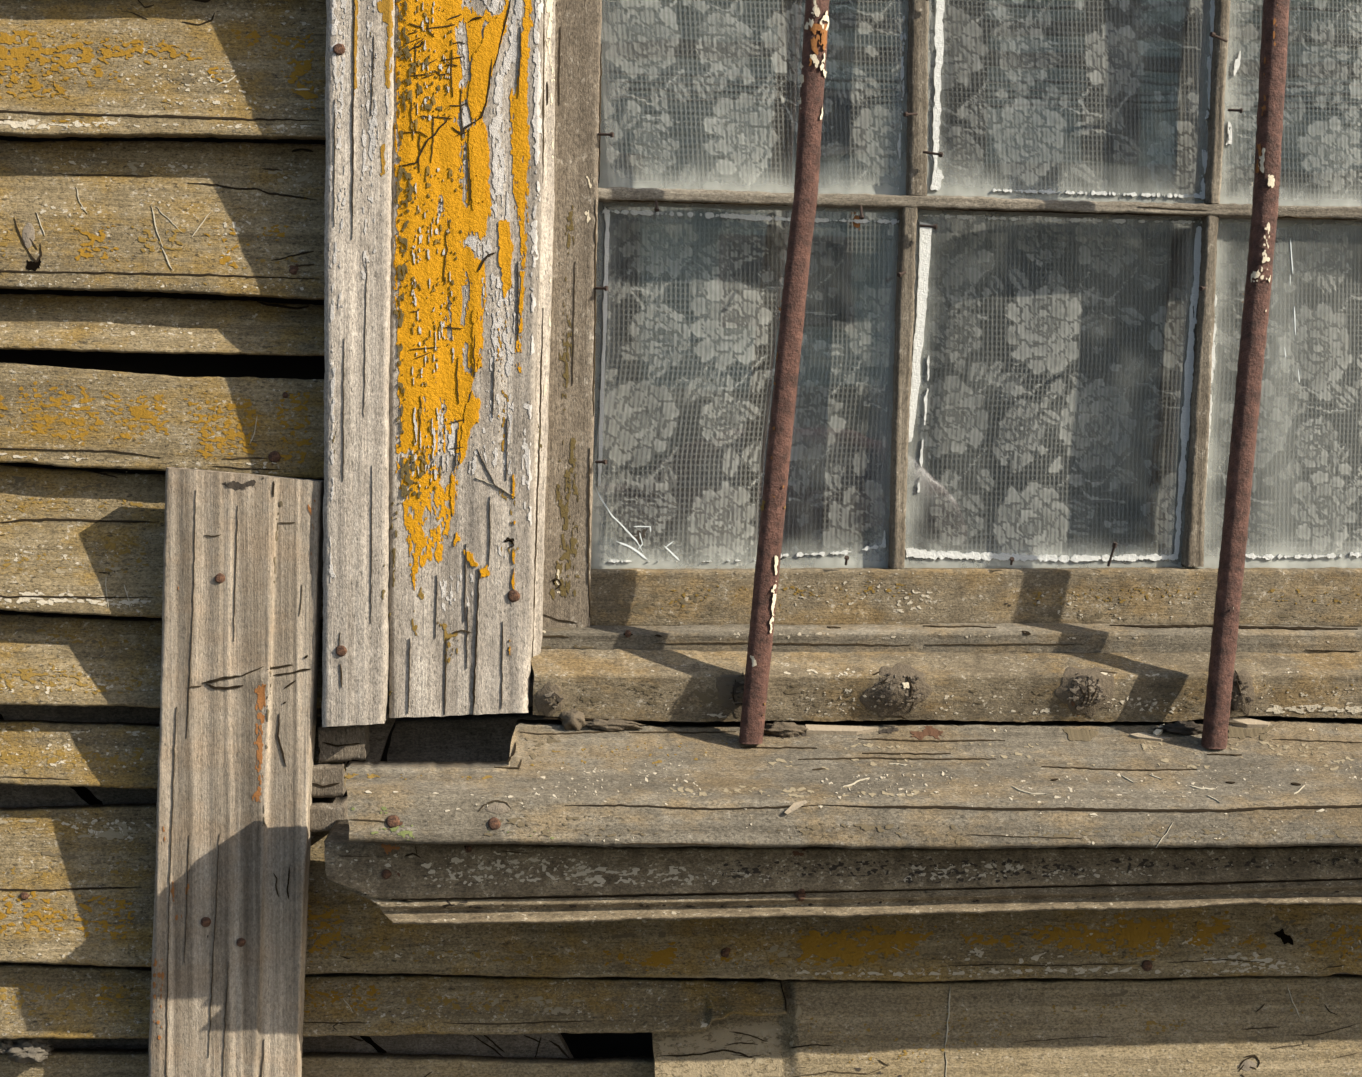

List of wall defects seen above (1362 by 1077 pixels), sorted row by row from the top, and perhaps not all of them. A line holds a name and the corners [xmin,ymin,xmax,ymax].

rust [809,24,827,66]
crack [0,0,374,465]
peeling [0,0,555,663]
crack [0,448,161,478]
crack [216,457,296,524]
crack [368,483,376,609]
crack [323,740,360,748]
crack [0,497,342,1077]
crack [303,1022,387,1053]
crack [444,1020,589,1058]